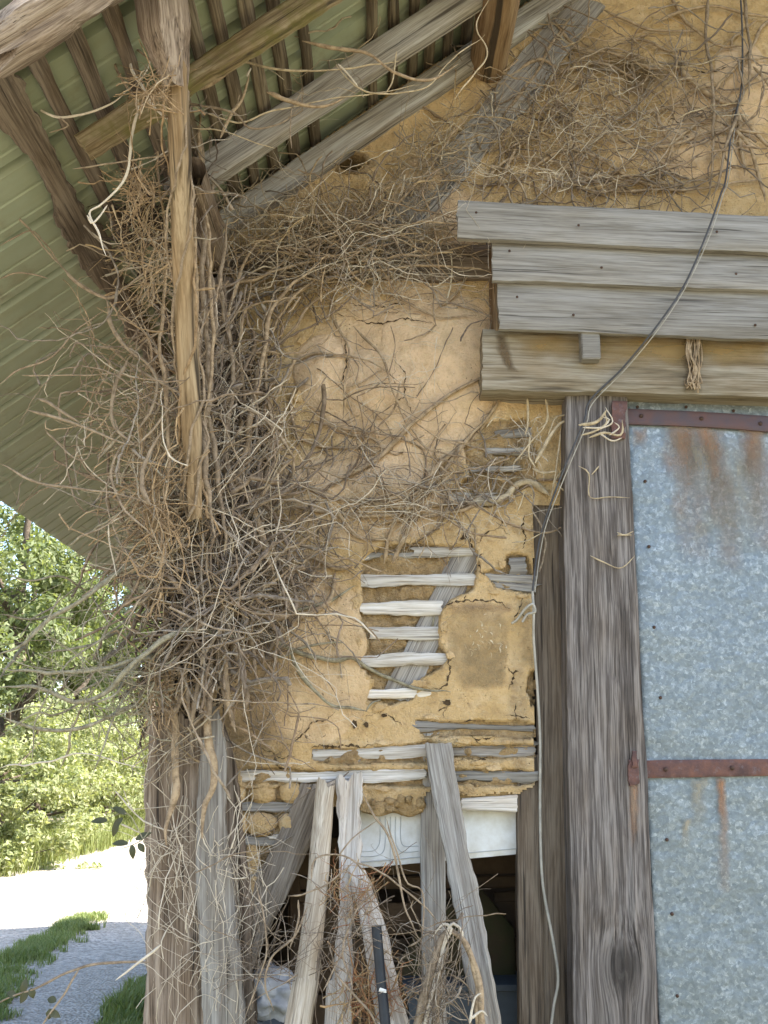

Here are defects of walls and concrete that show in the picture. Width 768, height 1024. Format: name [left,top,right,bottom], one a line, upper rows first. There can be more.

spalling [453,419,537,507]
crack [442,593,524,620]
spalling [240,536,536,869]